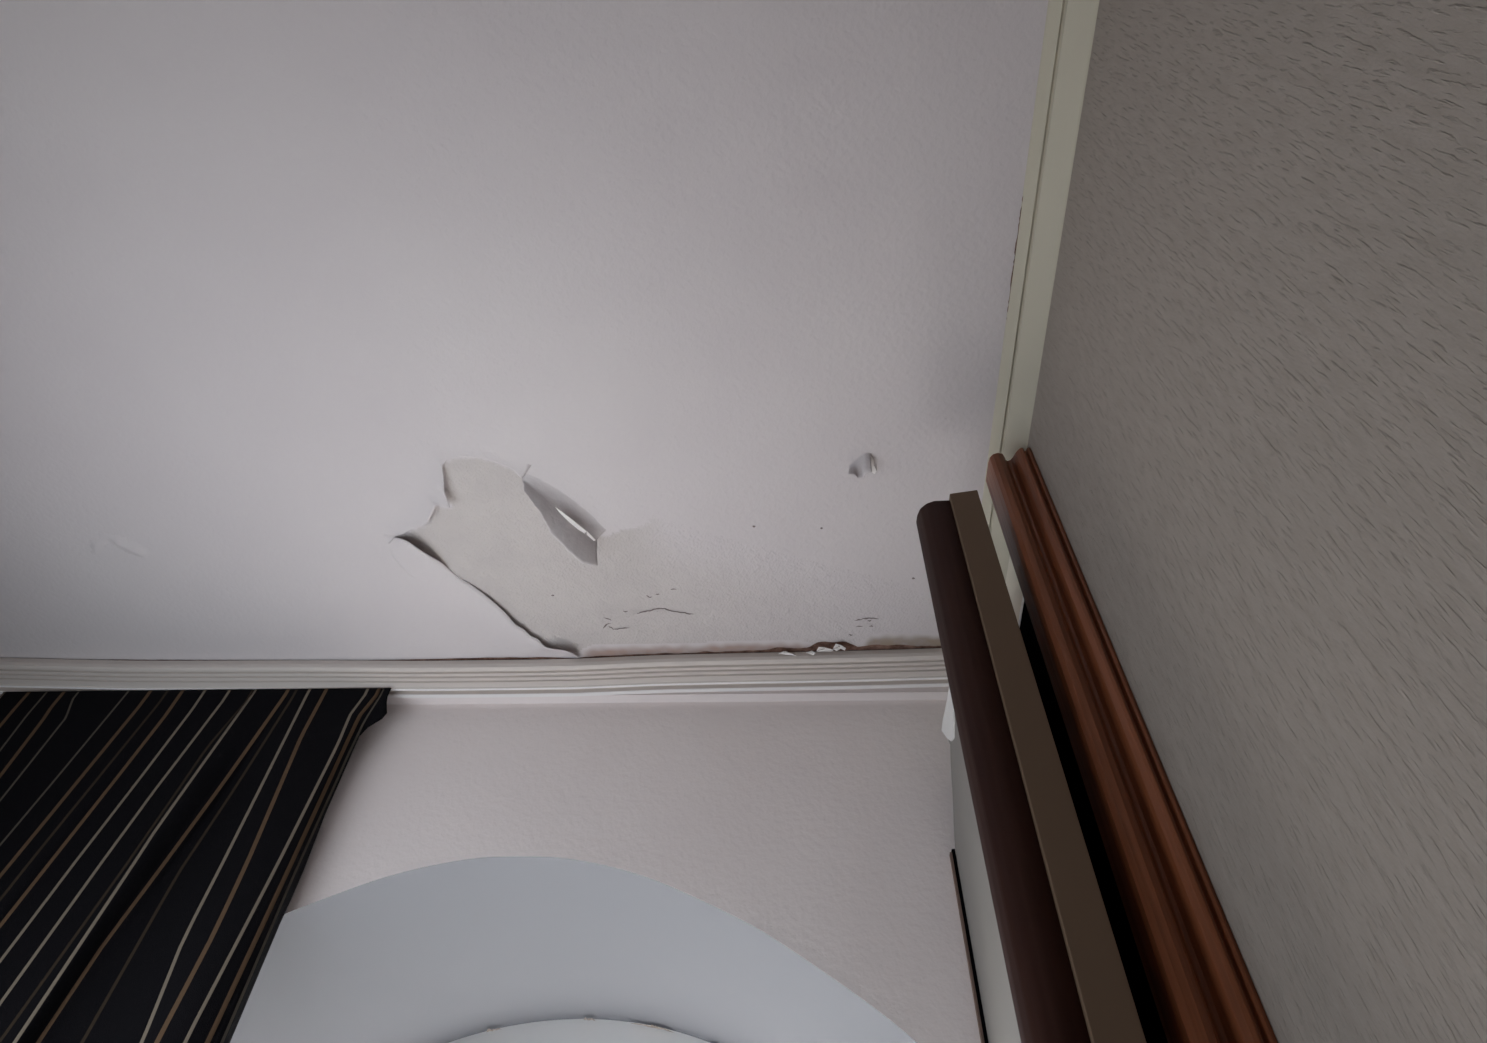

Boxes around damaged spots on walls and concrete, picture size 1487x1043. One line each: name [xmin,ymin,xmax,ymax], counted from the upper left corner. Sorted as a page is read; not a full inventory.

peeling [383,445,939,658]